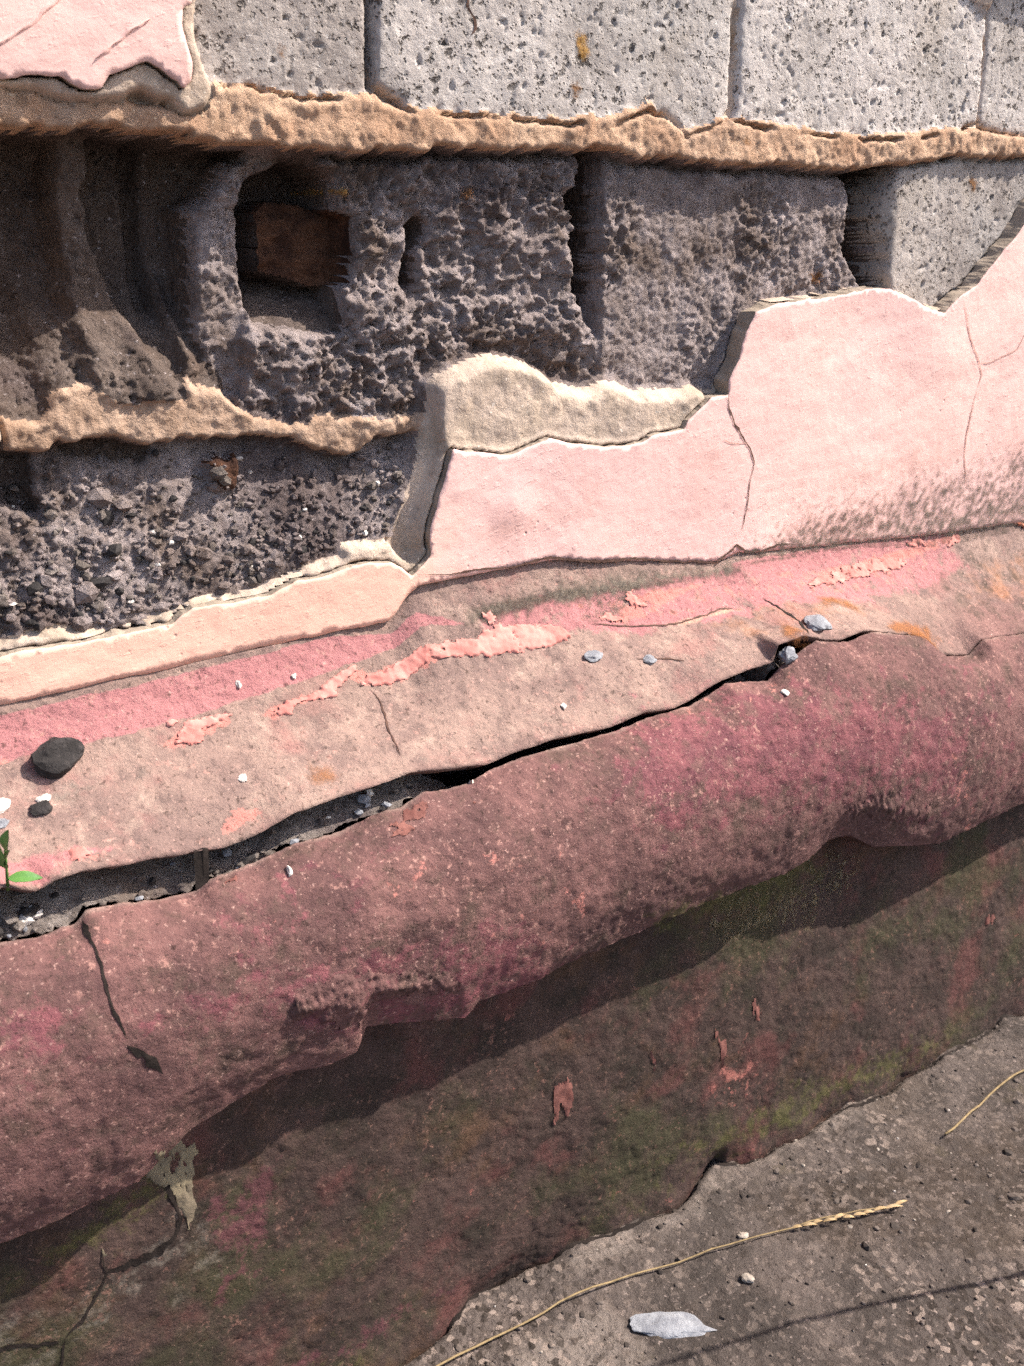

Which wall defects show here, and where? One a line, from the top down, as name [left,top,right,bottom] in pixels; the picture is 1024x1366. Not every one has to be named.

spalling [0,0,1024,650]
crack [964,303,1024,475]
crack [417,398,803,575]
mould [780,451,1024,557]
peeling [166,711,232,746]
peeling [275,610,571,716]
crack [588,599,809,661]
crack [676,655,784,710]
crack [0,689,467,1074]
crack [0,1164,183,1366]